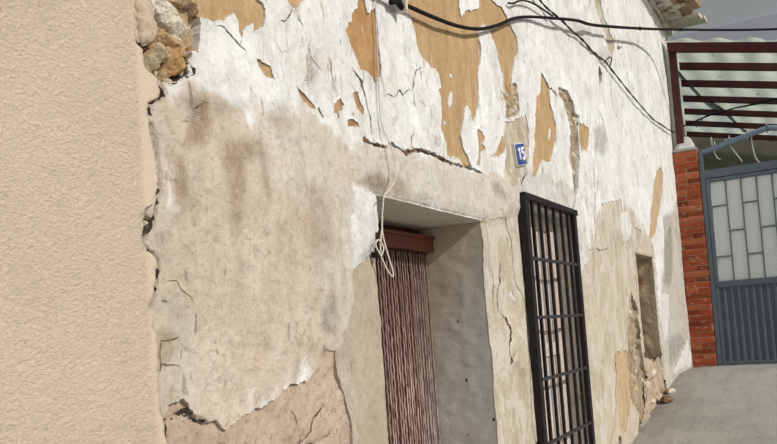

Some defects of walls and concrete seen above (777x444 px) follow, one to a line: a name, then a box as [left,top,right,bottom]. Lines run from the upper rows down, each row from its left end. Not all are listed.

spalling [134,0,269,87]
peeling [255,56,276,82]
peeling [284,0,306,12]
crack [354,70,375,142]
peeling [295,0,590,196]
peeling [593,0,623,60]
spalling [163,191,388,444]
crack [492,262,513,364]
peeling [581,163,692,444]
crack [292,405,331,444]